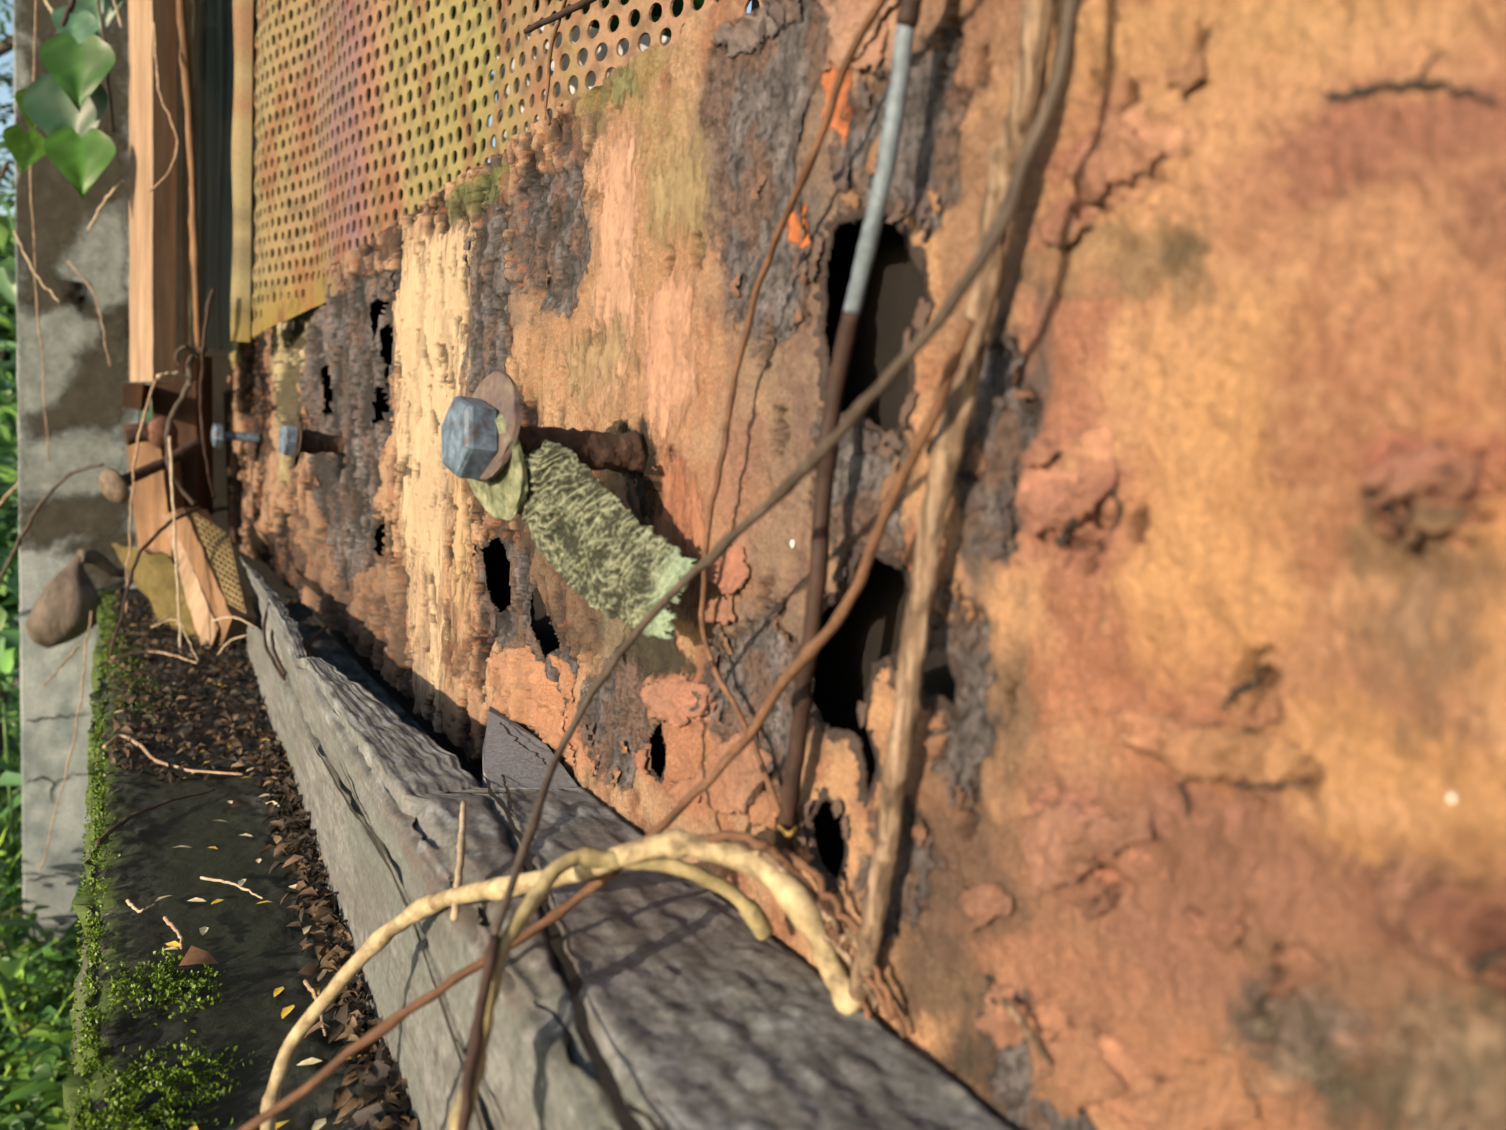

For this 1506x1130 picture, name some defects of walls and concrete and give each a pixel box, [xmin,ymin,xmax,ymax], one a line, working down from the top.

spalling [460,163,592,396]
spalling [699,0,899,358]
spalling [886,25,987,241]
peeling [1035,122,1165,251]
spalling [298,268,401,592]
spalling [808,391,918,584]
spalling [955,320,1120,563]
spalling [467,538,800,830]
spalling [925,579,1005,835]
crack [481,722,662,1130]
spalling [881,795,948,944]
peeling [974,940,1340,1130]